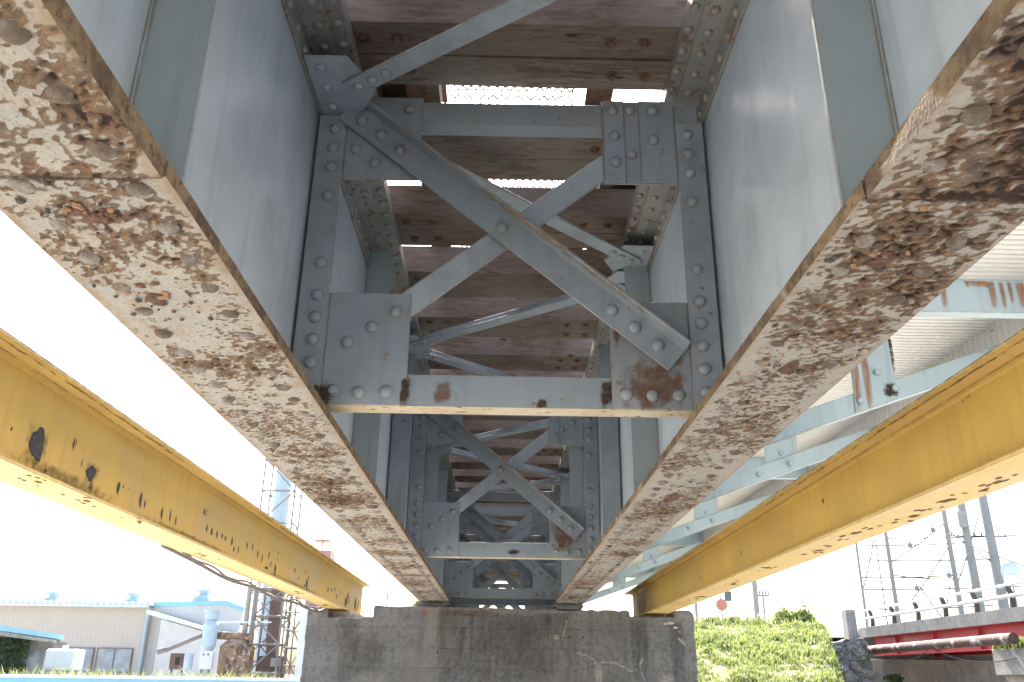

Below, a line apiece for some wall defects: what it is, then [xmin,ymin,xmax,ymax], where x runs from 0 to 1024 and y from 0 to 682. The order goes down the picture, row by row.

peeling [40,202,120,244]
peeling [113,282,184,321]
rust [965,281,1024,305]
rust [400,379,410,404]
rust [434,384,449,402]
rust [601,382,612,405]
rust [631,363,682,409]
peeling [17,427,47,486]
peeling [76,460,96,507]
peeling [801,474,1018,555]
peeling [203,509,279,575]
rust [555,526,573,548]